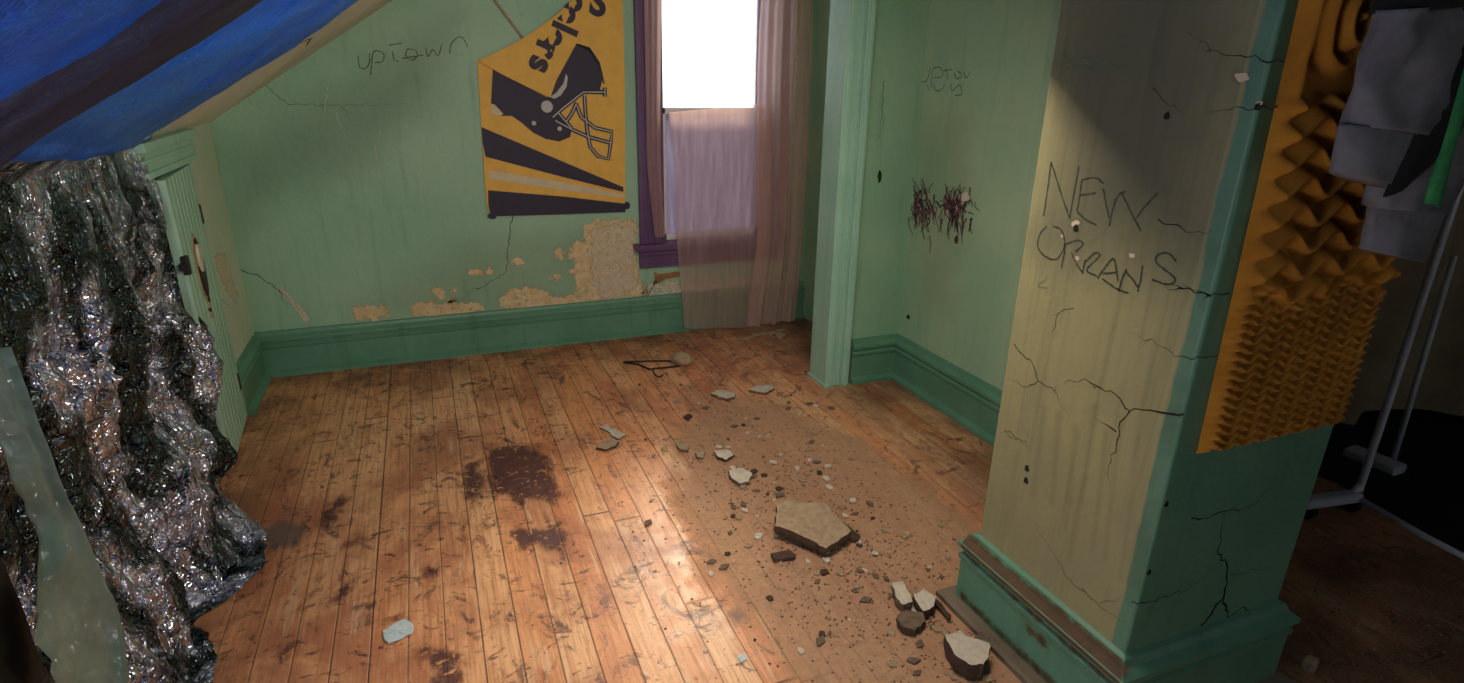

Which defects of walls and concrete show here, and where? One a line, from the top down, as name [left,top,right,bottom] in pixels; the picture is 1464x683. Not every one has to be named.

peeling [408,218,747,317]
peeling [351,303,390,321]
crack [1135,333,1218,360]
crack [1010,308,1184,482]
water stain [463,446,560,505]
water stain [510,526,566,550]
crack [1034,476,1282,627]